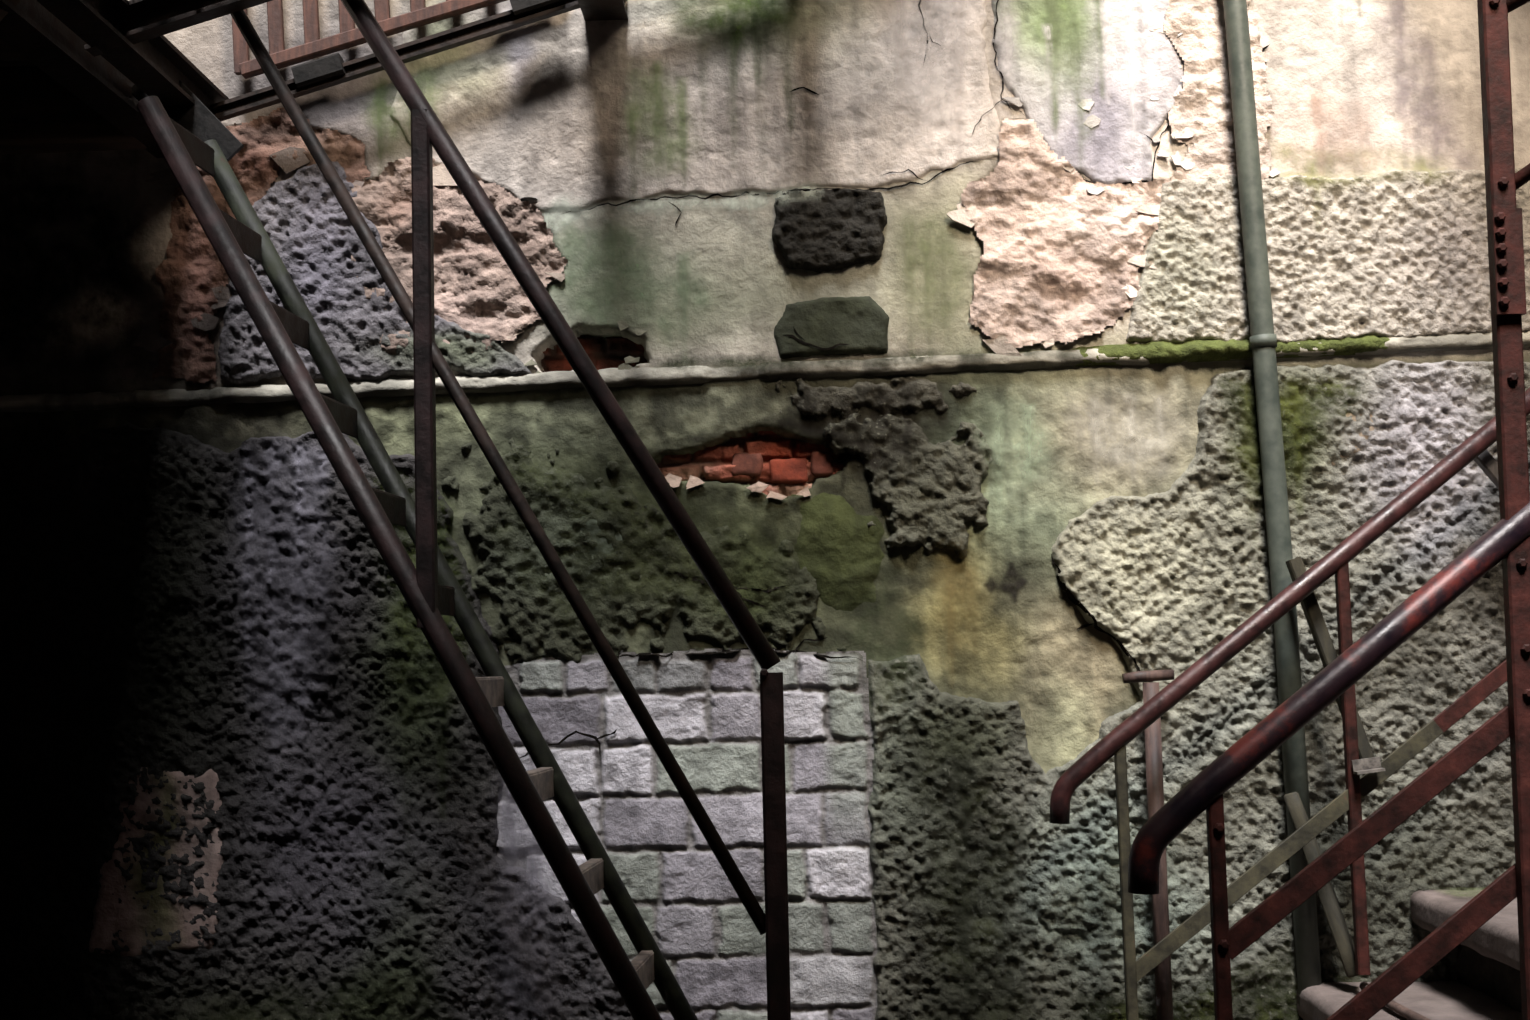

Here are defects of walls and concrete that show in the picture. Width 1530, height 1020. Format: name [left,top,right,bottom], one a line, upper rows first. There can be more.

flaking render [1246,0,1280,180]
flaking render [196,166,236,219]
flaking render [221,91,413,311]
flaking render [403,0,1238,356]
flaking render [132,169,232,383]
flaking render [379,320,410,355]
flaking render [524,344,573,374]
flaking render [577,320,648,370]
flaking render [657,431,845,500]